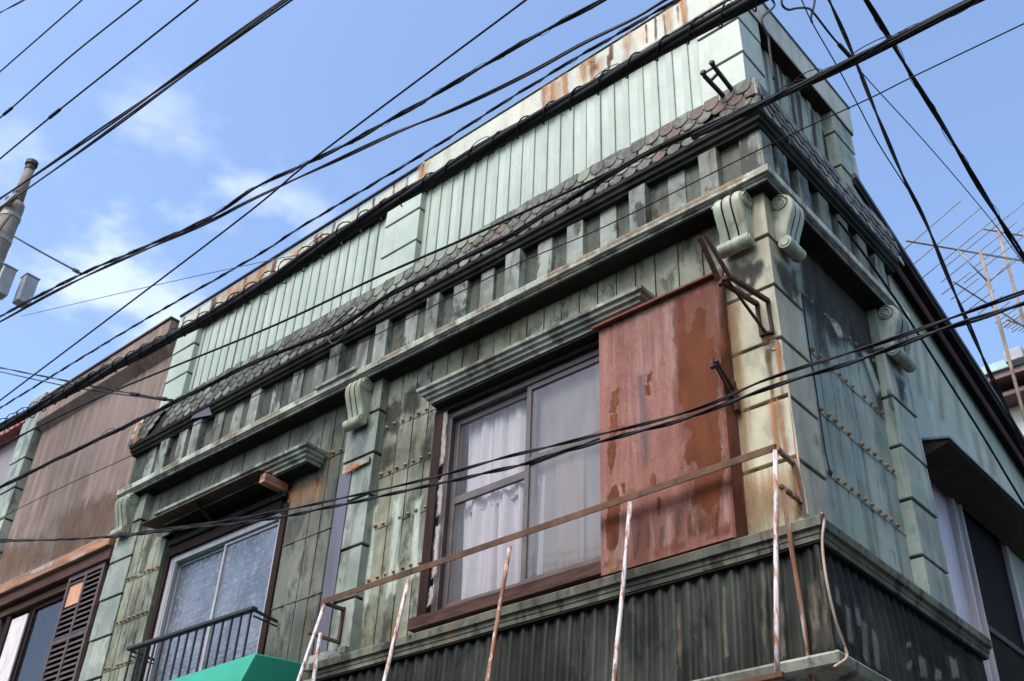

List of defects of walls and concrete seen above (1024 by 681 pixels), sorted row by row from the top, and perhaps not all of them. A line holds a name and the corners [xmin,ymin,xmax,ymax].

rust [645,0,687,42]
rust [587,45,613,80]
rust [542,73,568,108]
leakage [729,259,762,291]
leakage [777,261,800,301]
rust [762,334,786,451]
rust [605,387,625,554]
leakage [0,494,118,582]